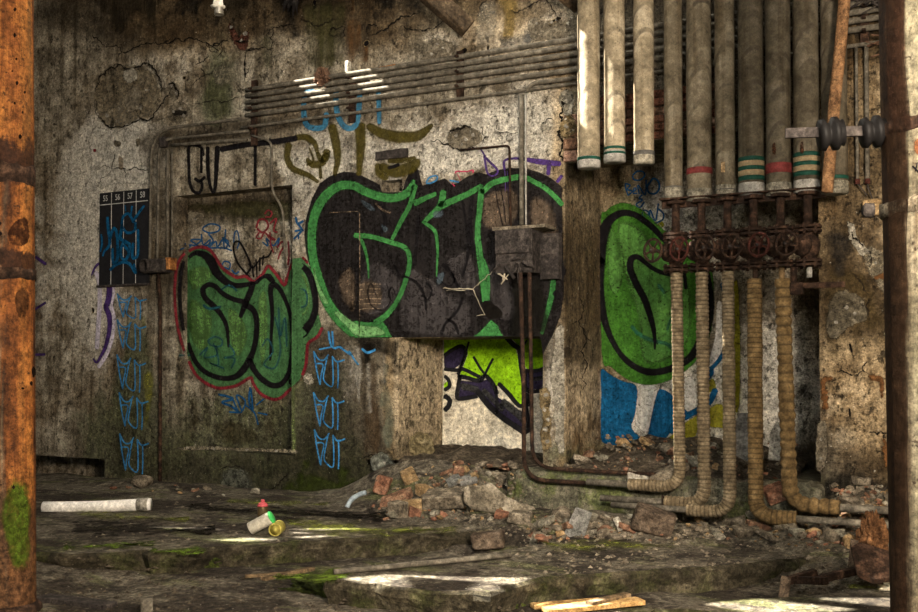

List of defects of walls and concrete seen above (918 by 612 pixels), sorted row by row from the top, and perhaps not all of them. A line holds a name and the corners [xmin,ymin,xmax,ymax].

crack [92,12,443,104]
flaking render [90,60,192,190]
flaking render [447,125,482,150]
flaking render [557,89,578,164]
flaking render [625,93,634,143]
flaking render [654,89,664,139]
rust [0,160,36,187]
rust [8,217,29,246]
rust [0,266,37,318]
leakage [825,475,886,499]